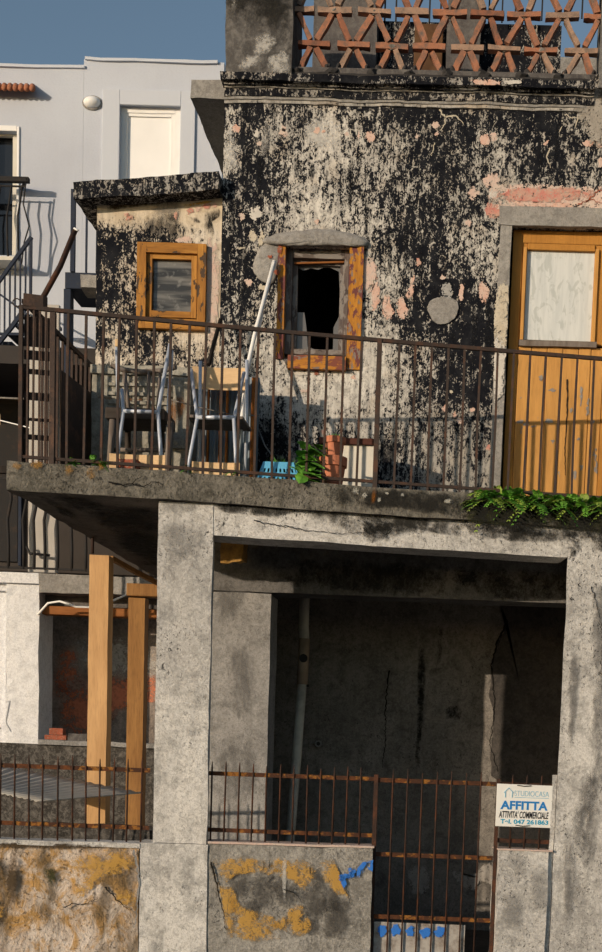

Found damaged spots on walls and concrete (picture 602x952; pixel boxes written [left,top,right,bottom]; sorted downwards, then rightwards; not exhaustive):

water stain [228,0,290,27]
water stain [109,201,212,213]
peeling [468,172,602,219]
peeling [363,258,421,320]
water stain [259,418,295,462]
water stain [216,504,294,516]
water stain [312,488,602,556]
crack [489,620,508,771]
water stain [569,661,577,734]
water stain [0,843,90,902]
crack [210,862,227,930]
peeling [219,858,347,940]